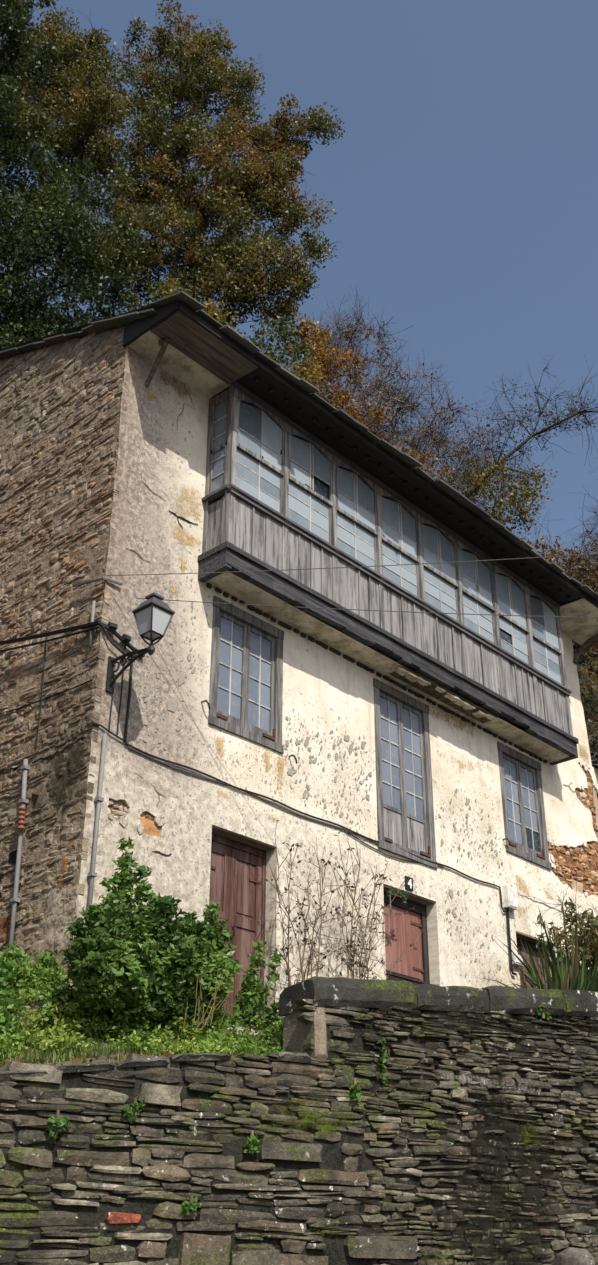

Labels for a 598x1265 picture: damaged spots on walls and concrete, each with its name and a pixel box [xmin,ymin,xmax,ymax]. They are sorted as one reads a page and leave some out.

spalling [107,799,166,837]
spalling [538,762,598,897]